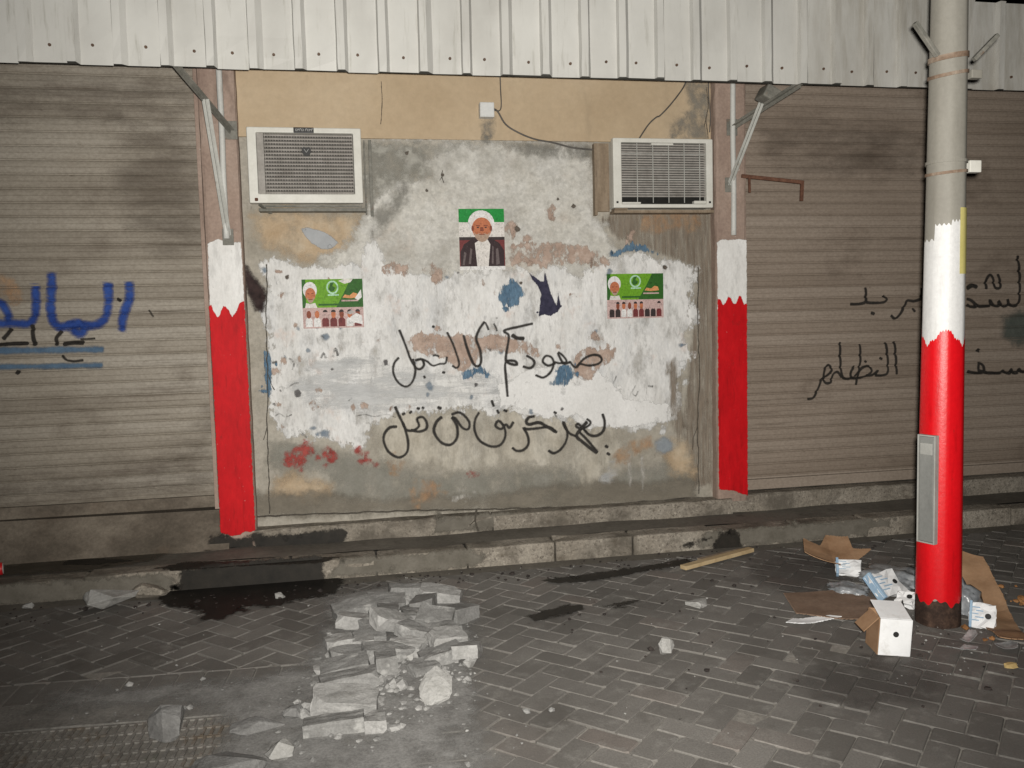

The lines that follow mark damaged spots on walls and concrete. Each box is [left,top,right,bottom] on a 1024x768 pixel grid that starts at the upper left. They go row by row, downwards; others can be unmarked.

peeling [251,207,361,261]
peeling [382,261,409,276]
peeling [422,264,447,285]
peeling [504,221,613,316]
peeling [260,349,310,407]
peeling [409,325,541,399]
peeling [574,330,616,380]
peeling [272,458,331,496]
peeling [667,442,697,475]
leakage [155,528,348,621]